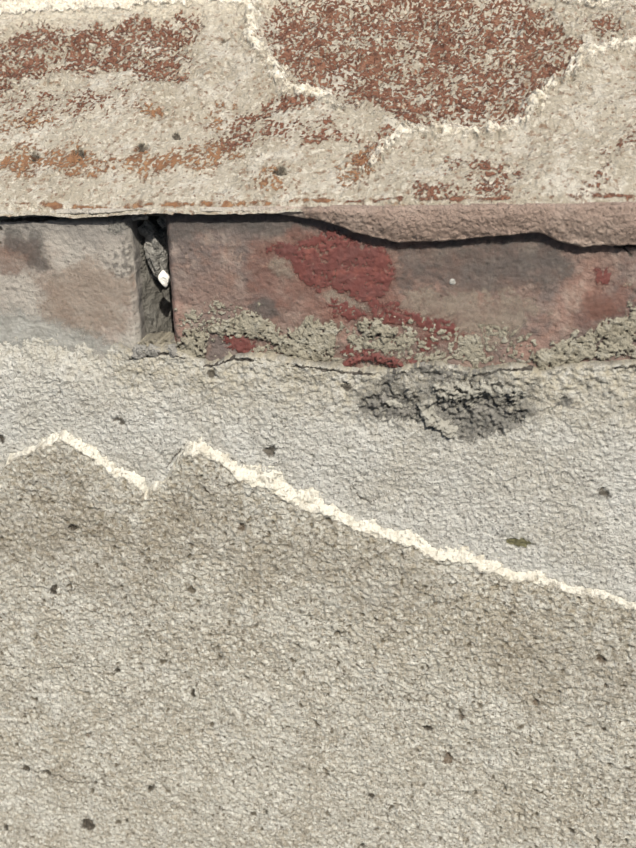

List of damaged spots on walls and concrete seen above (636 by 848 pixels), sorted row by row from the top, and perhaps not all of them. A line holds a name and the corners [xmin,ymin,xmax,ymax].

peeling [579,10,636,41]
peeling [0,9,204,129]
peeling [236,0,584,173]
crack [0,216,67,243]
peeling [158,270,171,287]
spalling [174,230,636,443]
crack [203,355,254,367]
crack [287,364,372,376]
crack [450,365,533,388]
spalling [0,429,636,610]